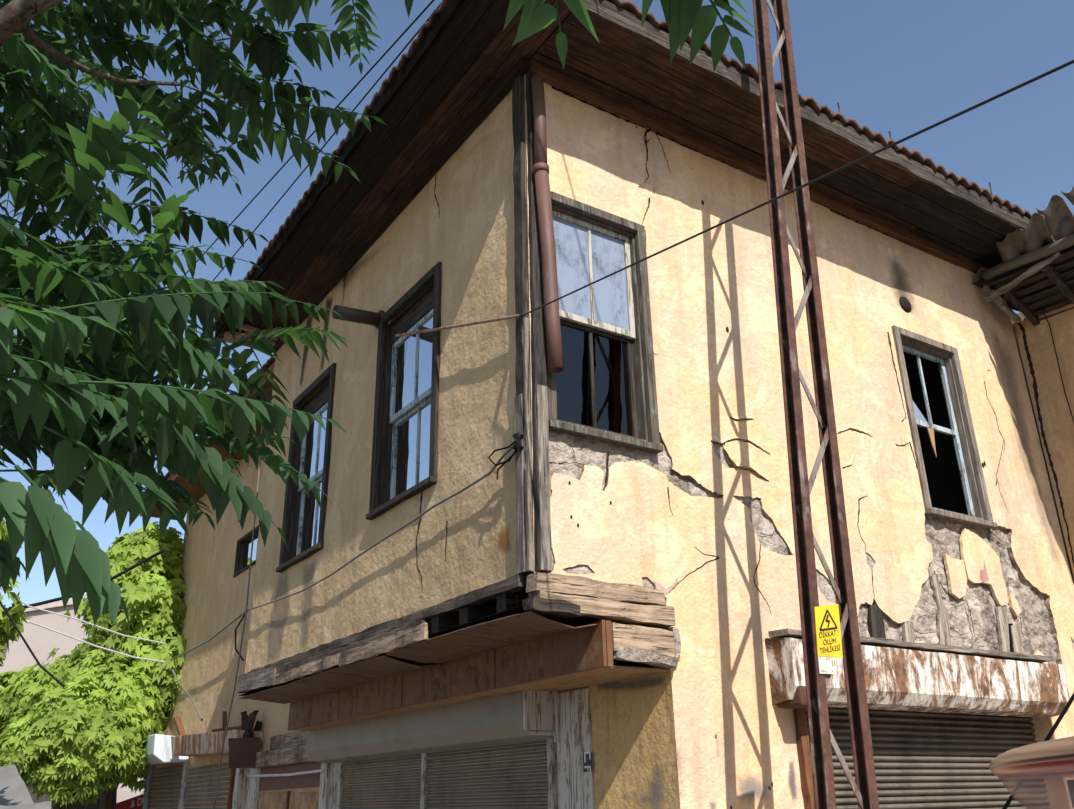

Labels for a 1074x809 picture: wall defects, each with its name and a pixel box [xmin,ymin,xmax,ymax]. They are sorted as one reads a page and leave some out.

crack [552,86,767,254]
crack [830,209,957,266]
spalling [548,430,793,555]
crack [669,550,720,593]
crack [753,545,771,613]
crack [857,496,875,597]
spalling [858,513,1074,665]